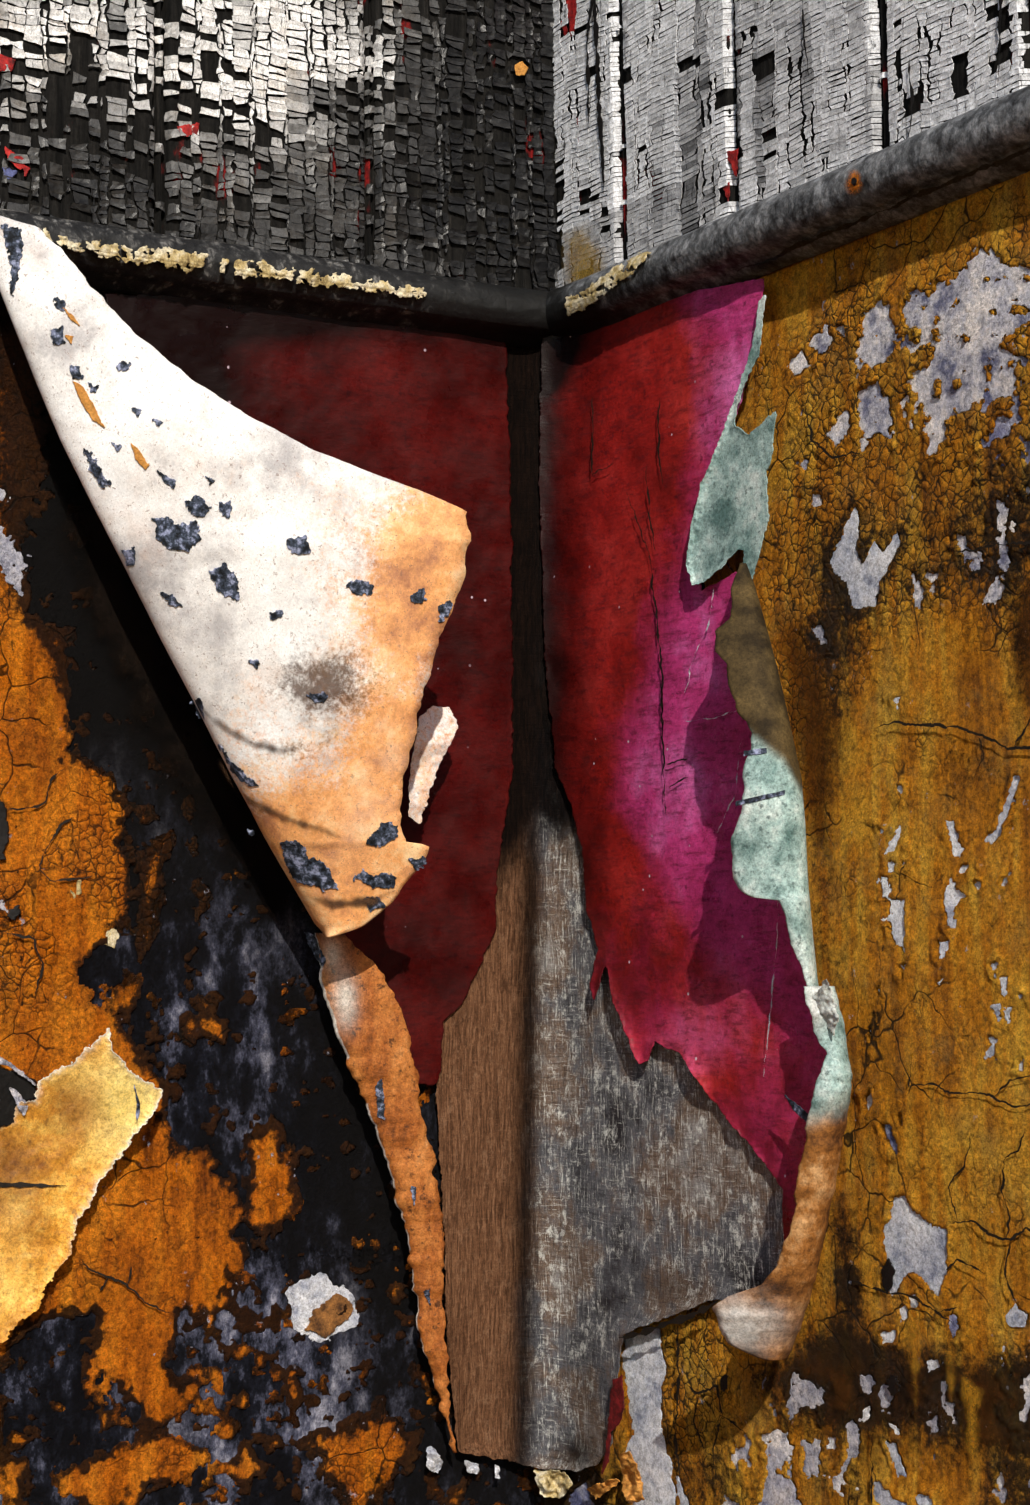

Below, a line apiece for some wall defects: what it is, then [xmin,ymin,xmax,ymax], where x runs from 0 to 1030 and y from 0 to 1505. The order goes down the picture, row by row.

corrosion [848,172,860,192]
peeling [0,223,24,296]
peeling [43,228,427,299]
peeling [787,247,1030,466]
peeling [830,508,901,609]
peeling [957,487,1030,605]
peeling [538,279,827,1240]
crack [876,718,1030,769]
peeling [0,294,689,1505]
crack [908,1060,1030,1305]
crack [851,1279,960,1330]
peeling [731,1372,932,1505]